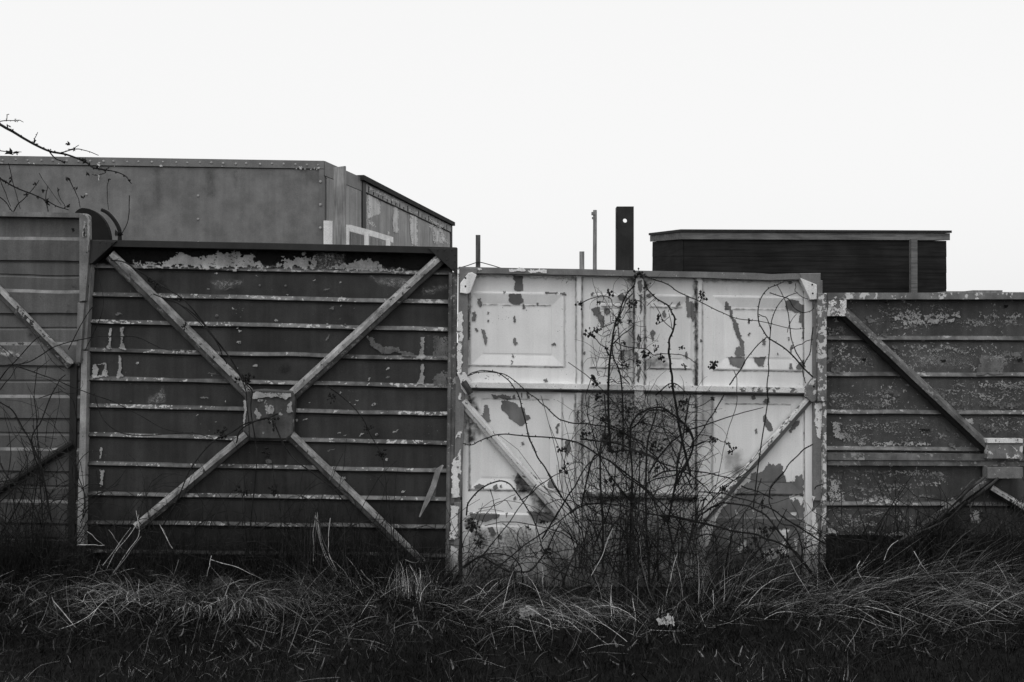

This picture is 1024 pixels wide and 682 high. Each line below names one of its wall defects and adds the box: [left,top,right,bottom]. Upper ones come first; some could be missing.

peeling [92,313,126,378]
peeling [133,250,404,310]
peeling [367,298,489,388]
peeling [503,267,566,322]
peeling [591,292,610,327]
peeling [725,299,804,370]
peeling [893,311,961,327]
peeling [243,391,308,426]
peeling [481,392,530,426]
peeling [814,402,931,447]
peeling [827,469,943,511]
peeling [706,462,838,589]